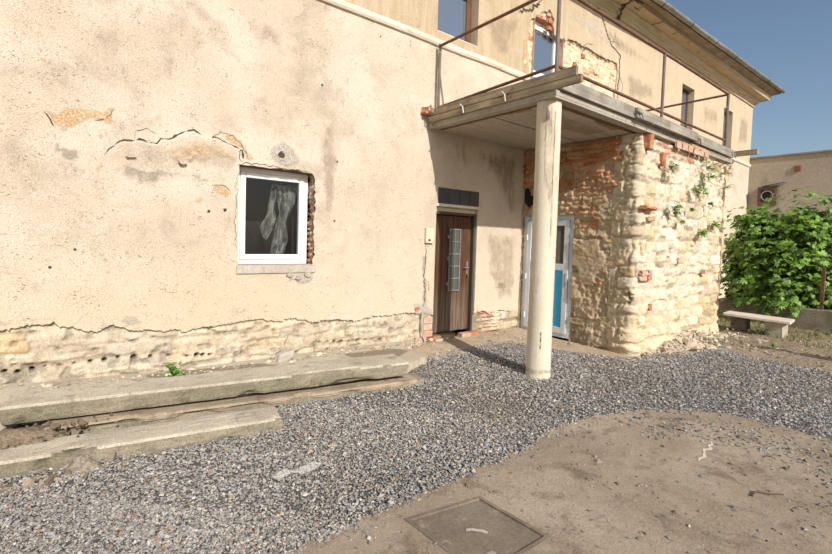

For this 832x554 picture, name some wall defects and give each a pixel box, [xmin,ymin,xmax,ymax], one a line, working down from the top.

crack [519,0,542,13]
flaking render [523,11,552,81]
flaking render [563,40,617,97]
crack [571,0,644,97]
flaking render [43,107,115,131]
crack [107,128,306,248]